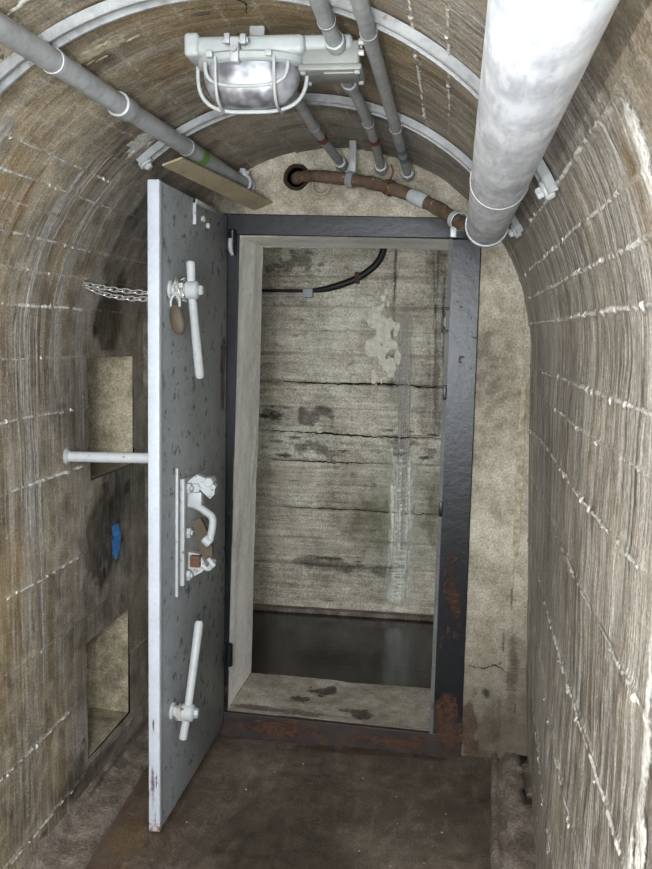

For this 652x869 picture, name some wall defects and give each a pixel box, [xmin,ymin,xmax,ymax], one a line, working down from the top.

efflorescence [439,0,486,54]
efflorescence [413,49,464,126]
peeling [363,282,401,386]
efflorescence [386,318,416,605]
efflorescence [524,98,652,869]